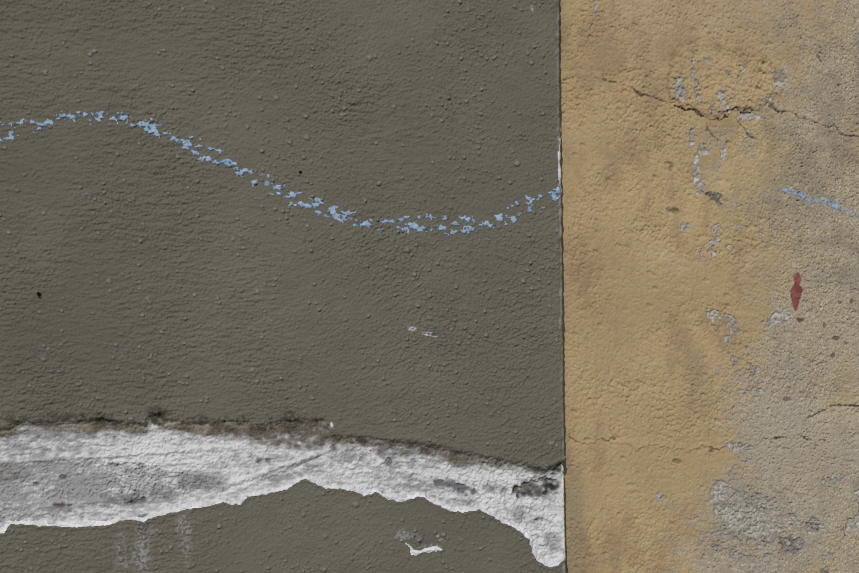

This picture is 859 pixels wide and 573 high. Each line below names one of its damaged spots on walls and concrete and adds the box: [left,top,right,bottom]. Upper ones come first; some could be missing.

peeling [672,57,713,101]
crack [603,79,858,138]
peeling [716,91,762,120]
peeling [689,128,727,207]
crack [774,404,859,443]
flaking render [0,412,566,567]
peeling [710,471,826,573]